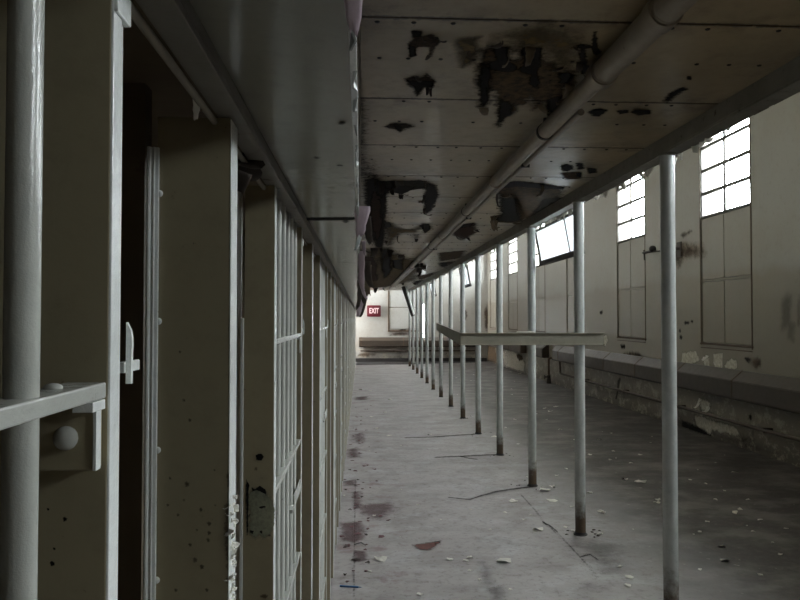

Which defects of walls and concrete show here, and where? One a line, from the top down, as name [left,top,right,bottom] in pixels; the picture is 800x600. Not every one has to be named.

peeling [407,31,447,60]
peeling [474,31,601,127]
peeling [375,180,440,216]
peeling [490,181,565,231]
spalling [681,351,760,369]
spalling [223,479,275,600]